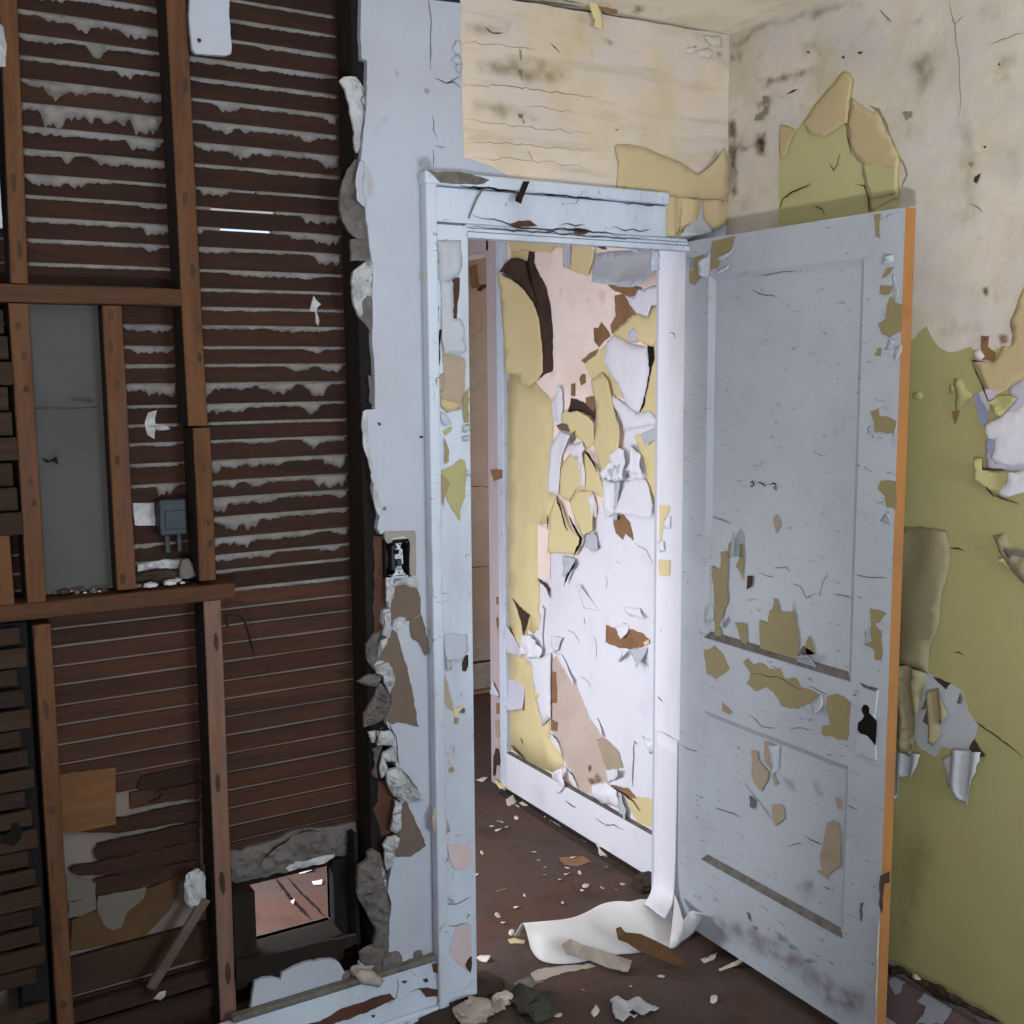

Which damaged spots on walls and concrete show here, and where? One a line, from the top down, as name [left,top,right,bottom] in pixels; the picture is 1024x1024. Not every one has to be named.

crack [428,0,589,169]
flaking render [451,0,730,188]
crack [949,2,962,117]
spalling [338,76,373,332]
crack [462,186,662,240]
peeling [422,239,470,521]
peeling [513,251,553,379]
peeling [556,284,642,449]
peeling [949,290,1024,497]
spalling [356,530,472,955]
peeling [704,531,816,679]
peeling [894,527,986,806]